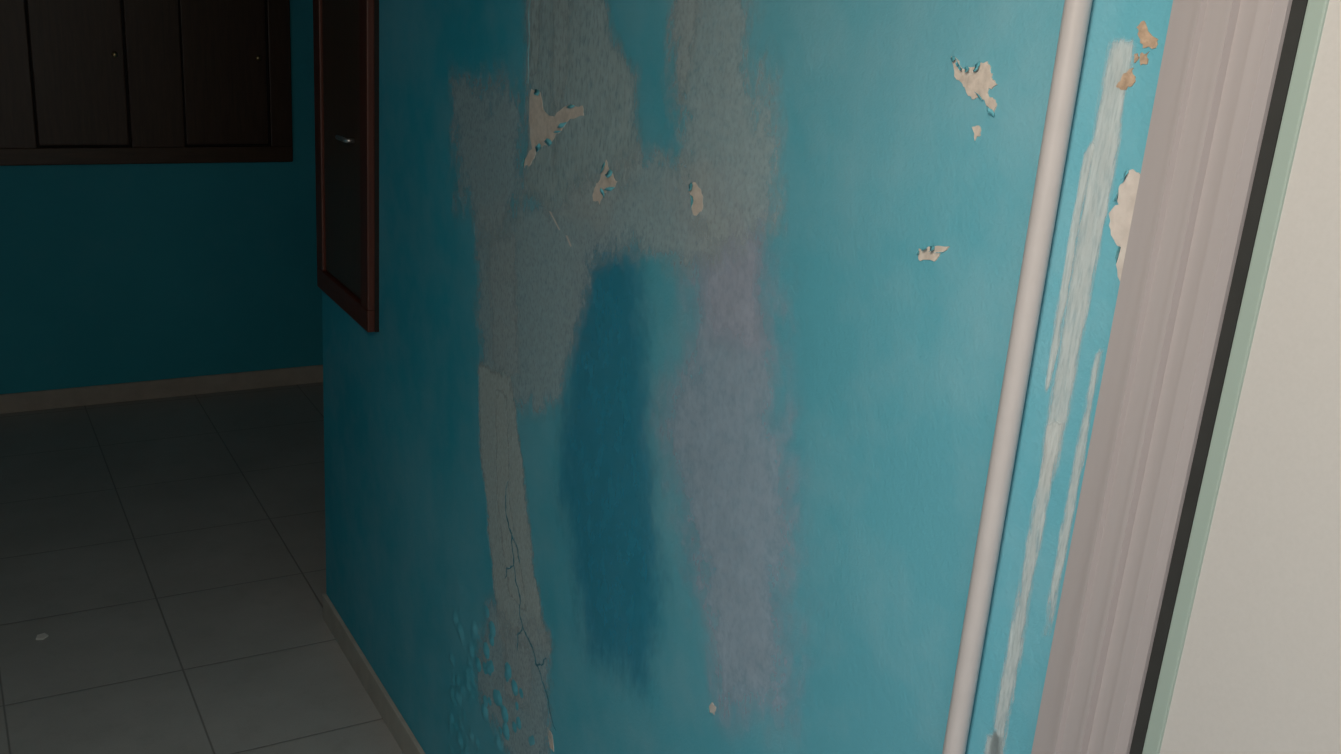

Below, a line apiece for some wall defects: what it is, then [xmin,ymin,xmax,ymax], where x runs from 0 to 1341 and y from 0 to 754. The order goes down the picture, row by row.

peeling [522,89,584,169]
peeling [951,56,998,141]
peeling [592,160,617,205]
peeling [688,182,703,216]
peeling [917,245,950,262]
peeling [1109,169,1140,280]